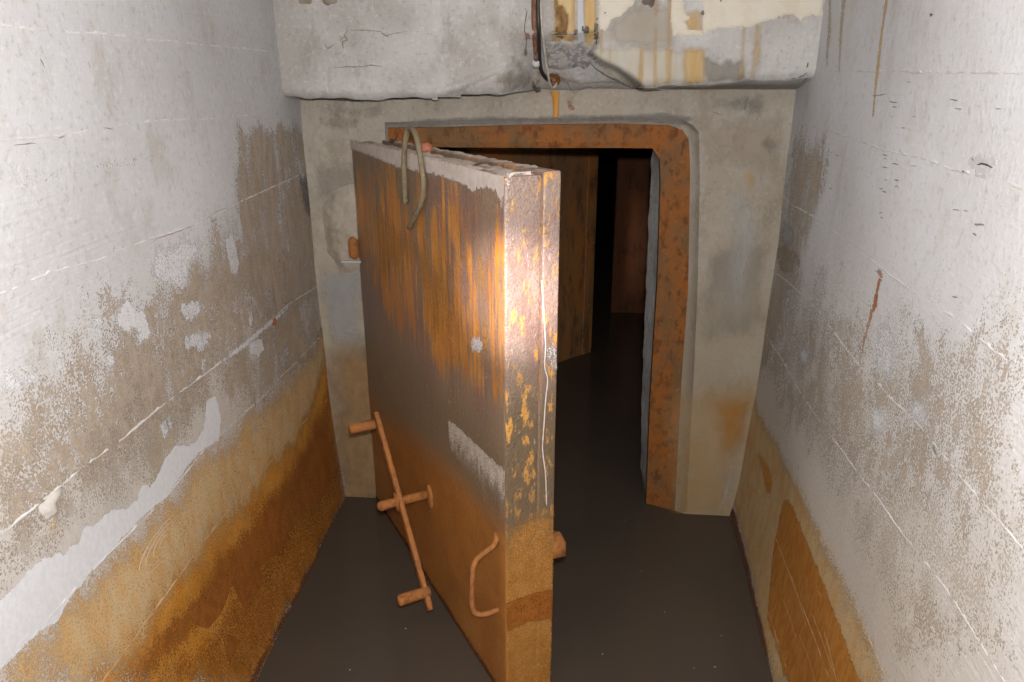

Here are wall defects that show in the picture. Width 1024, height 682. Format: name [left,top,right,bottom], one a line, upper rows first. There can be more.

crack [300,9,527,103]
rust [551,91,574,118]
spalling [542,0,655,70]
flaking render [670,0,823,36]
rust [872,0,888,116]
rust [862,270,883,350]
damp [0,120,376,682]
damp [730,127,1024,682]